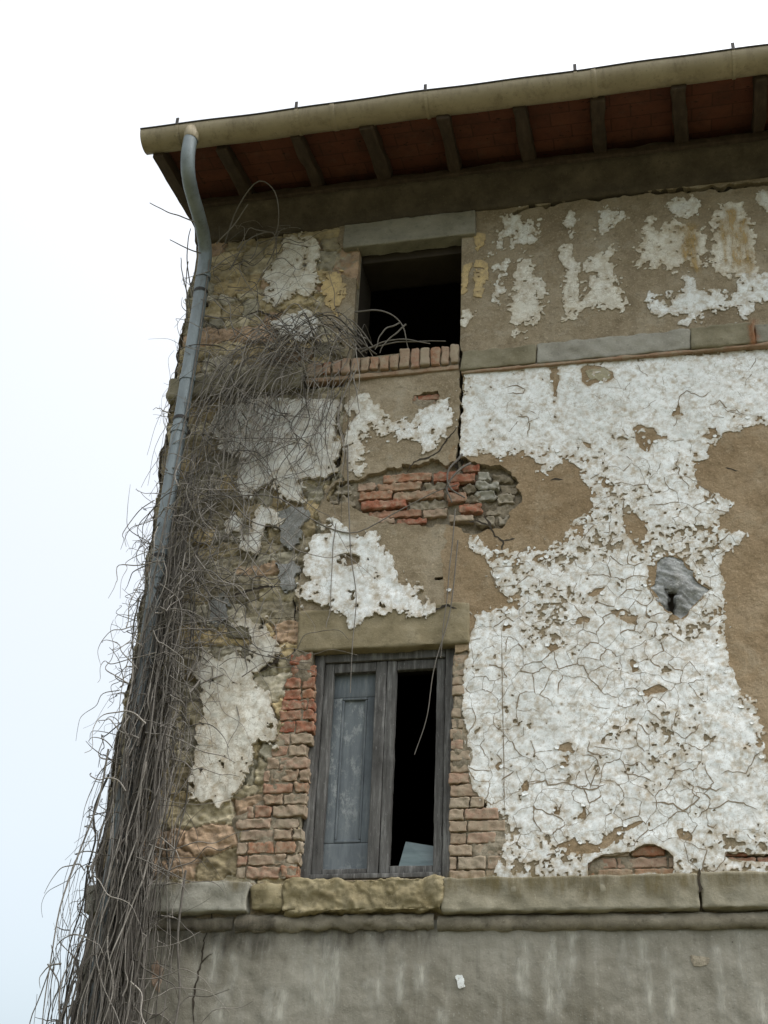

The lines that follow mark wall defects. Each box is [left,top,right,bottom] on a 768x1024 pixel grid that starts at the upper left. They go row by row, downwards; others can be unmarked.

peeling [262,231,347,344]
peeling [460,189,768,339]
peeling [549,367,560,403]
peeling [207,393,613,879]
crack [465,358,766,893]
peeling [611,607,638,625]
peeling [622,416,768,762]
flaking render [185,615,317,881]
flaking render [557,821,673,876]
peeling [677,827,693,841]
flaking render [726,853,768,862]
crack [192,914,213,1022]